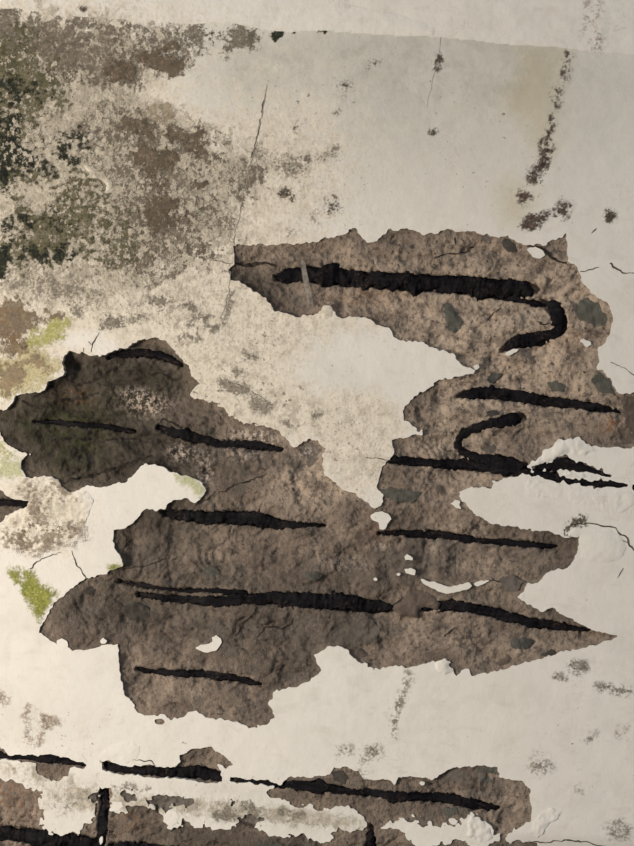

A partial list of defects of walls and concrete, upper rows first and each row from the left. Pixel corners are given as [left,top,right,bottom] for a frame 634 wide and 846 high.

damp [0,8,268,290]
crack [214,84,267,317]
damp [0,206,102,399]
damp [209,291,234,334]
crack [527,245,627,274]
spalling [0,228,634,728]
crack [564,517,634,551]
spalling [0,746,537,846]
crack [529,838,601,846]